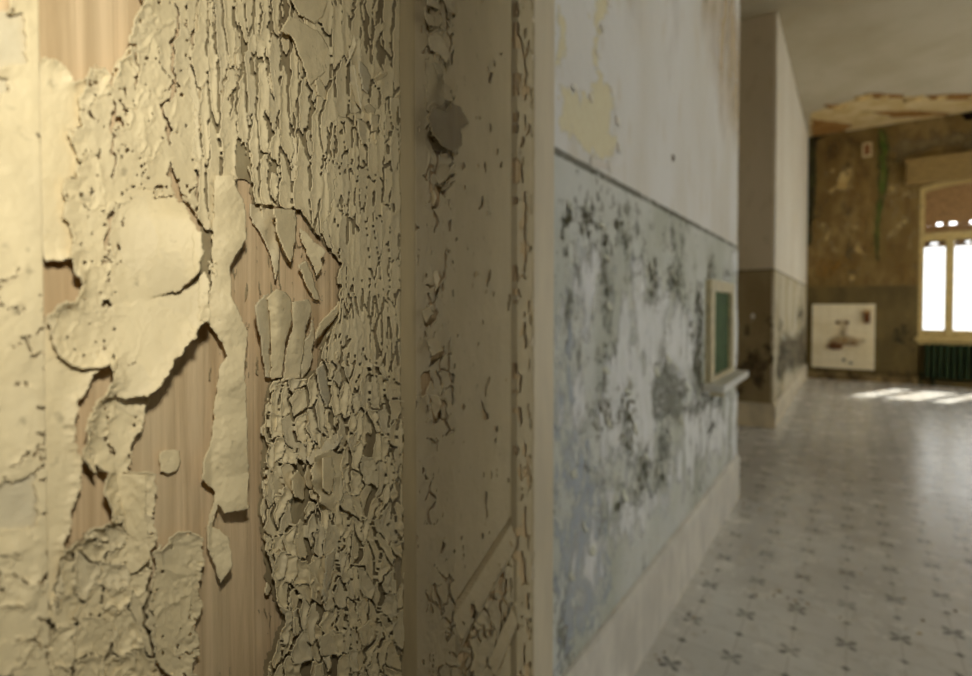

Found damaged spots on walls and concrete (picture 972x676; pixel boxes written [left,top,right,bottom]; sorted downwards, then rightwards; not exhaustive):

flaking render [808,93,972,137]
crack [185,0,401,368]
leakage [559,191,623,256]
leakage [683,252,731,434]
leakage [738,318,774,394]